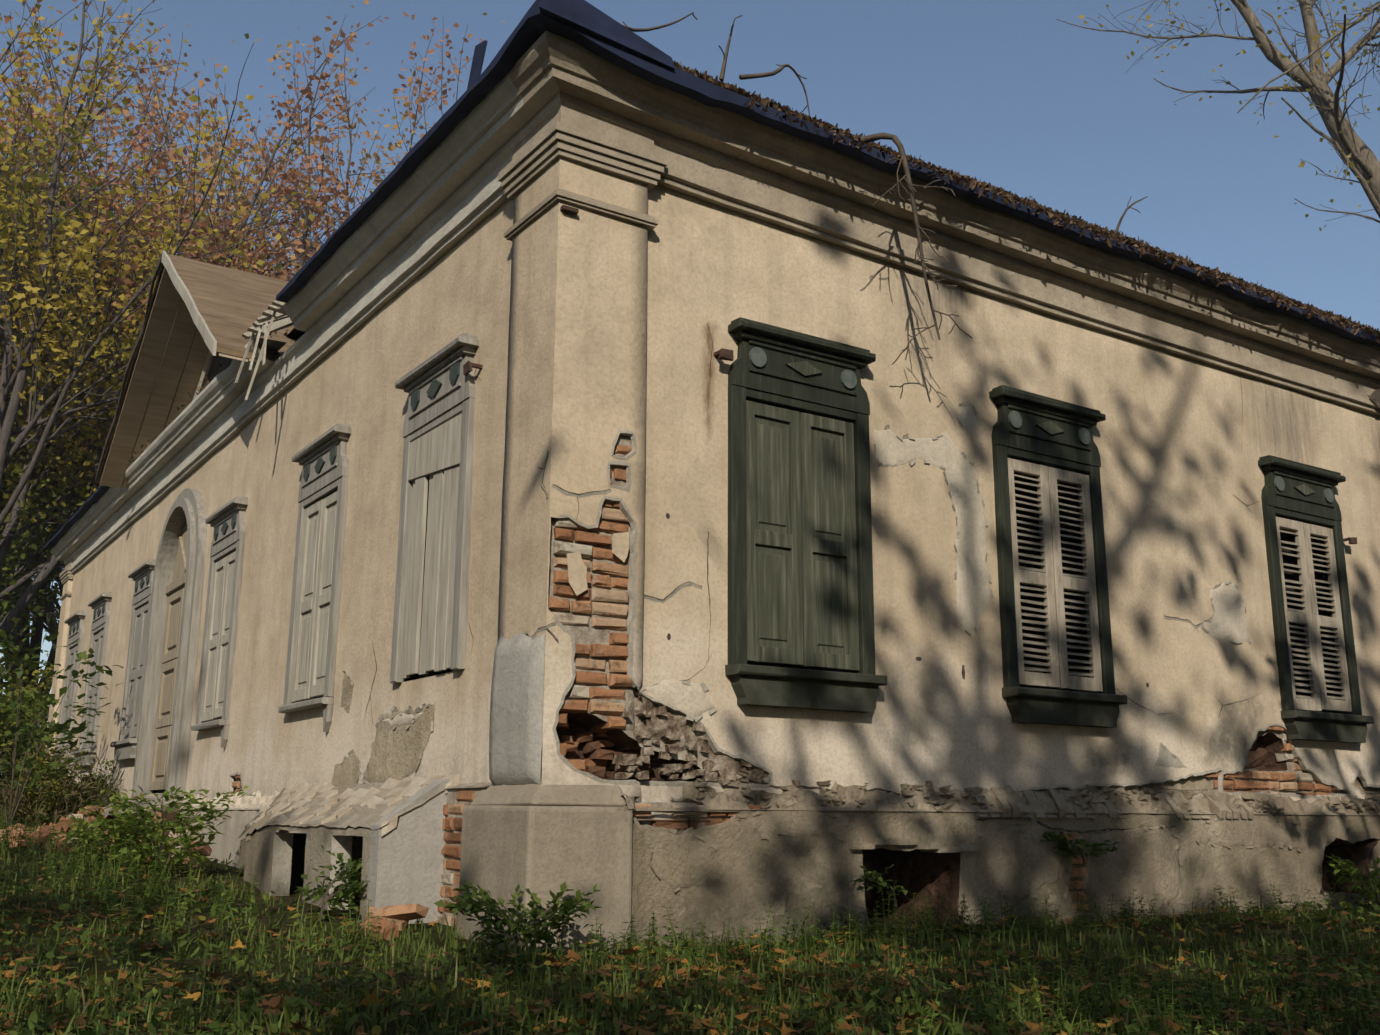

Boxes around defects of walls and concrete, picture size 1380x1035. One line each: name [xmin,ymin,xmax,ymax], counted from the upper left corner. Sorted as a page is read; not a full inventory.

peeling [873,403,994,635]
spalling [540,430,883,841]
spalling [437,782,504,928]
spalling [900,781,996,812]
spalling [975,700,1380,917]